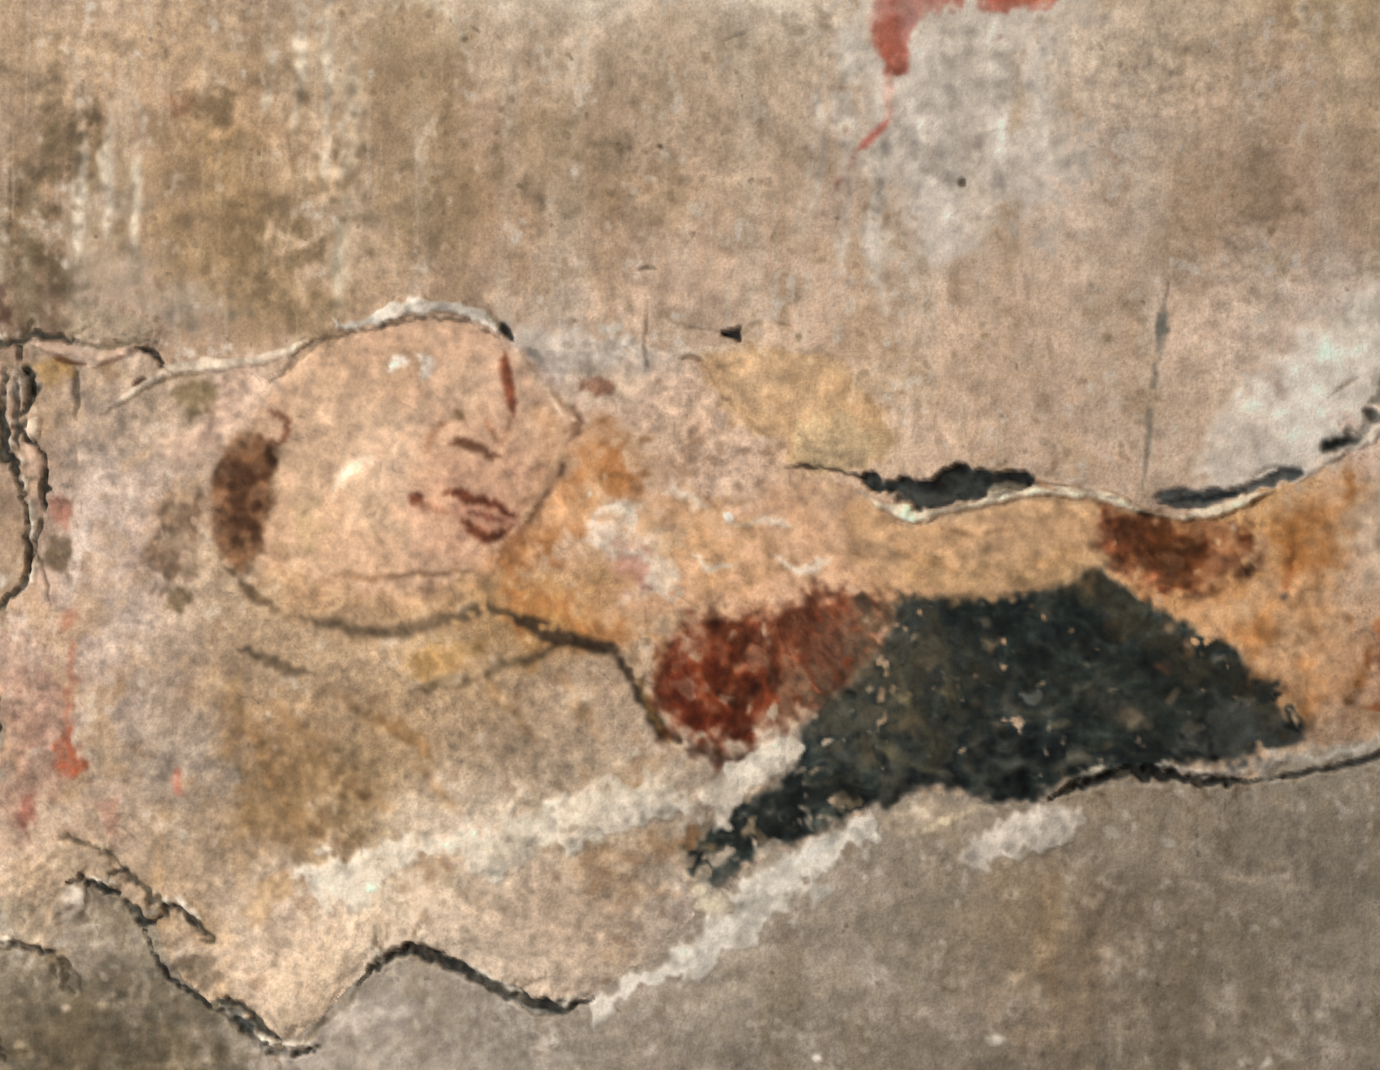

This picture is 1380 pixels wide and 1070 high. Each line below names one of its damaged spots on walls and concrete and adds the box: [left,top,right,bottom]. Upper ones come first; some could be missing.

crack [263,312,502,392]
crack [0,316,188,639]
crack [784,460,870,482]
crack [1027,478,1072,490]
crack [1249,464,1294,481]
crack [0,694,10,768]
crack [1047,748,1380,815]
crack [0,831,596,1070]
damp [941,840,1217,1070]
damp [0,922,606,1070]